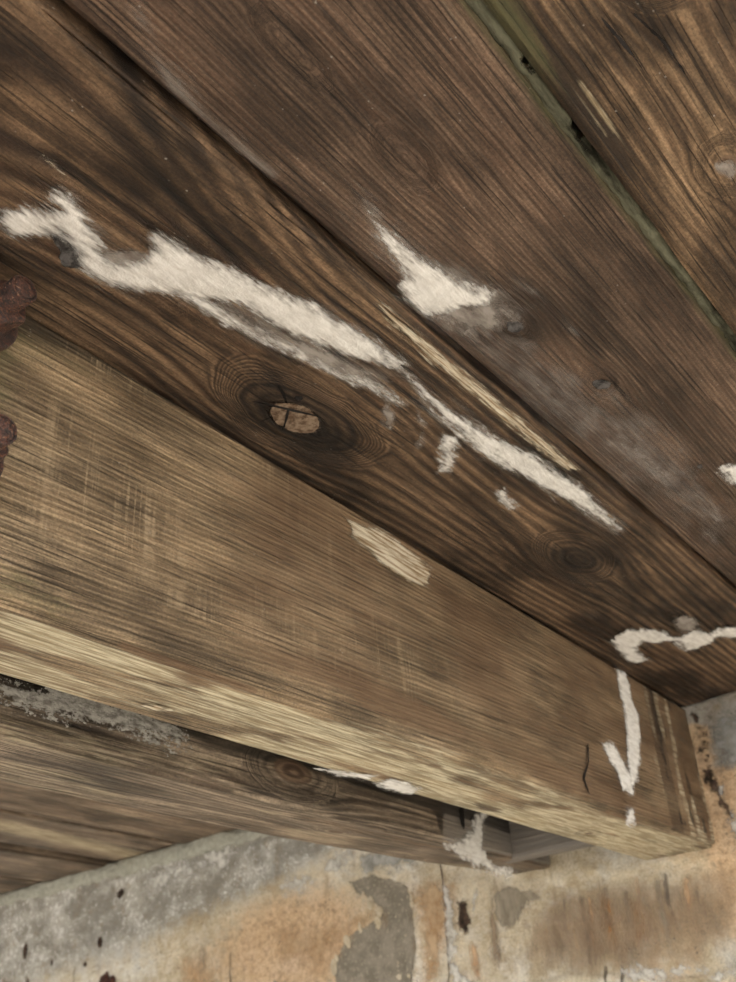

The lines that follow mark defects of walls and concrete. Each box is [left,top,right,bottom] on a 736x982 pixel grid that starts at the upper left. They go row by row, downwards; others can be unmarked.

water stain [0,190,402,428]
water stain [380,228,510,334]
water stain [408,377,621,529]
water stain [720,464,736,484]
water stain [611,616,736,663]
water stain [603,670,641,794]
water stain [443,813,513,878]
rust [99,971,115,982]
peeling [330,874,426,982]